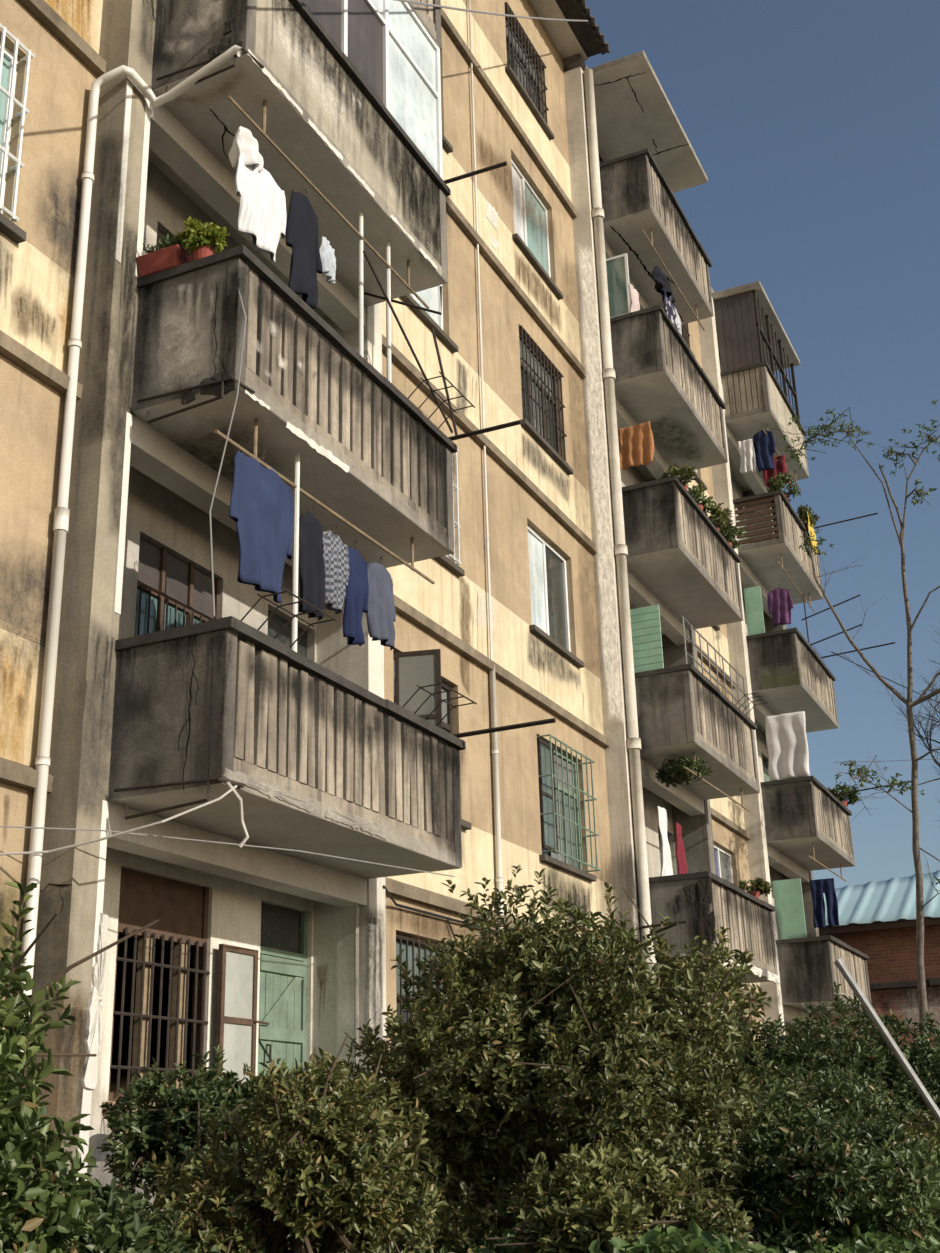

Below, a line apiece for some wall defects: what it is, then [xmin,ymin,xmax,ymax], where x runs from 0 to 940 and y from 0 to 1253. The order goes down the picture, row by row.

water stain [143,17,166,68]
water stain [275,0,449,266]
crack [594,72,688,155]
water stain [15,297,48,339]
water stain [188,430,251,473]
water stain [212,267,458,553]
water stain [458,365,477,413]
water stain [461,578,494,689]
water stain [83,635,148,804]
water stain [200,632,233,779]
water stain [252,655,462,852]
water stain [544,870,589,925]